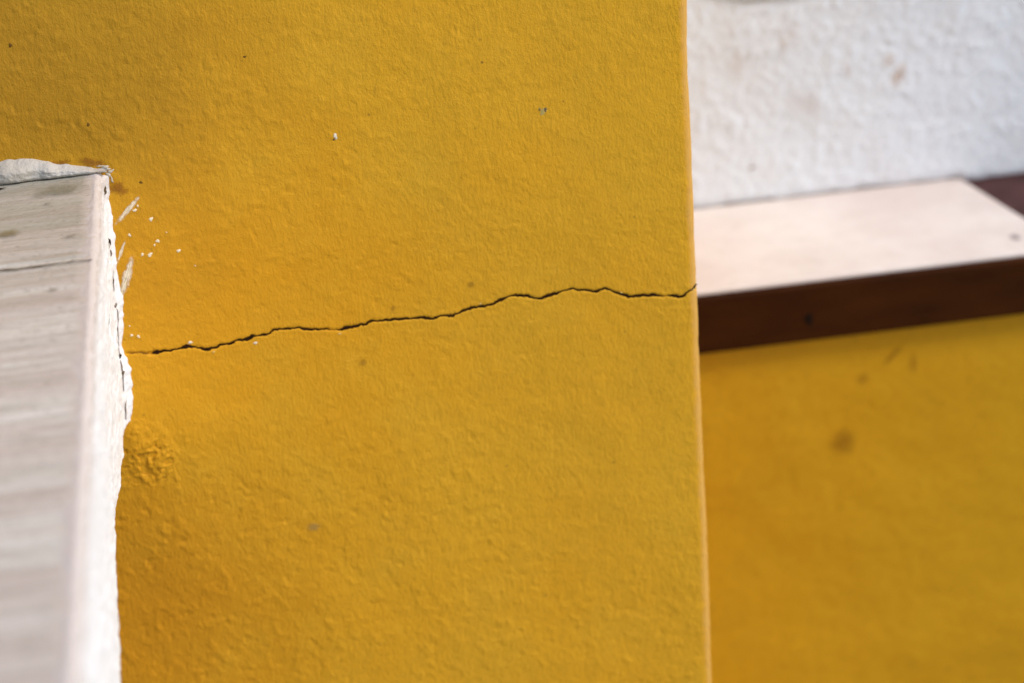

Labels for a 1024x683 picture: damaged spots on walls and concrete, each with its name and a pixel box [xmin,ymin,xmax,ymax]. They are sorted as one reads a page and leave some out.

crack [0,238,697,420]